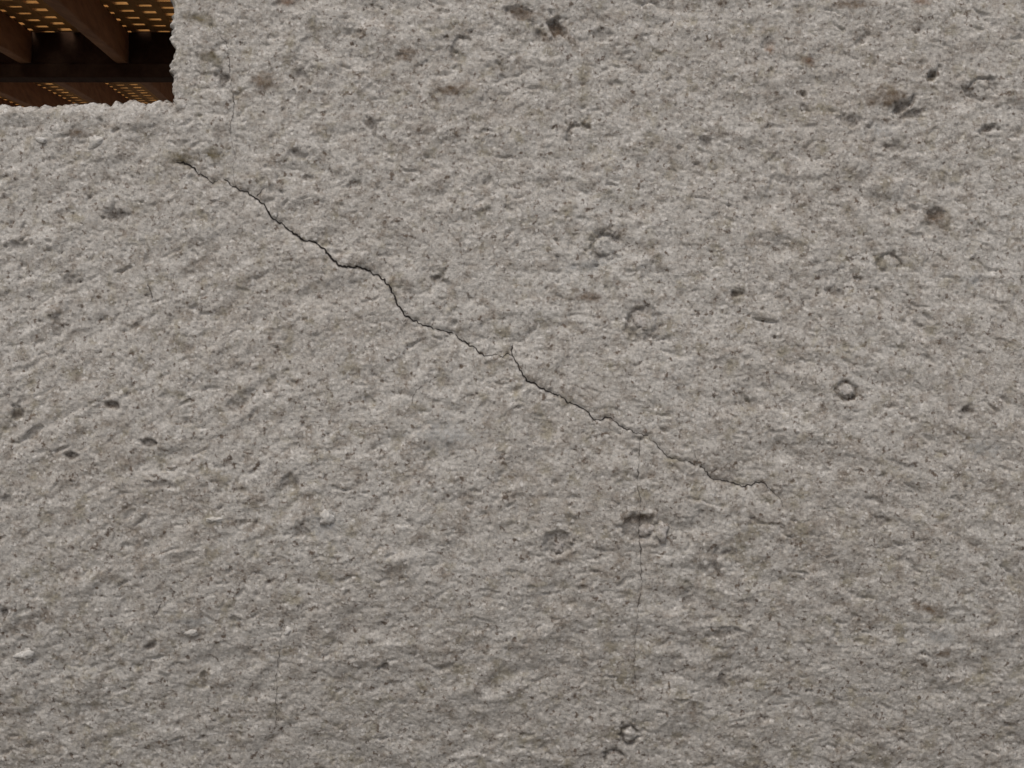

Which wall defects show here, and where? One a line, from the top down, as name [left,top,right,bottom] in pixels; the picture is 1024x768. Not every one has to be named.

crack [176,161,782,607]